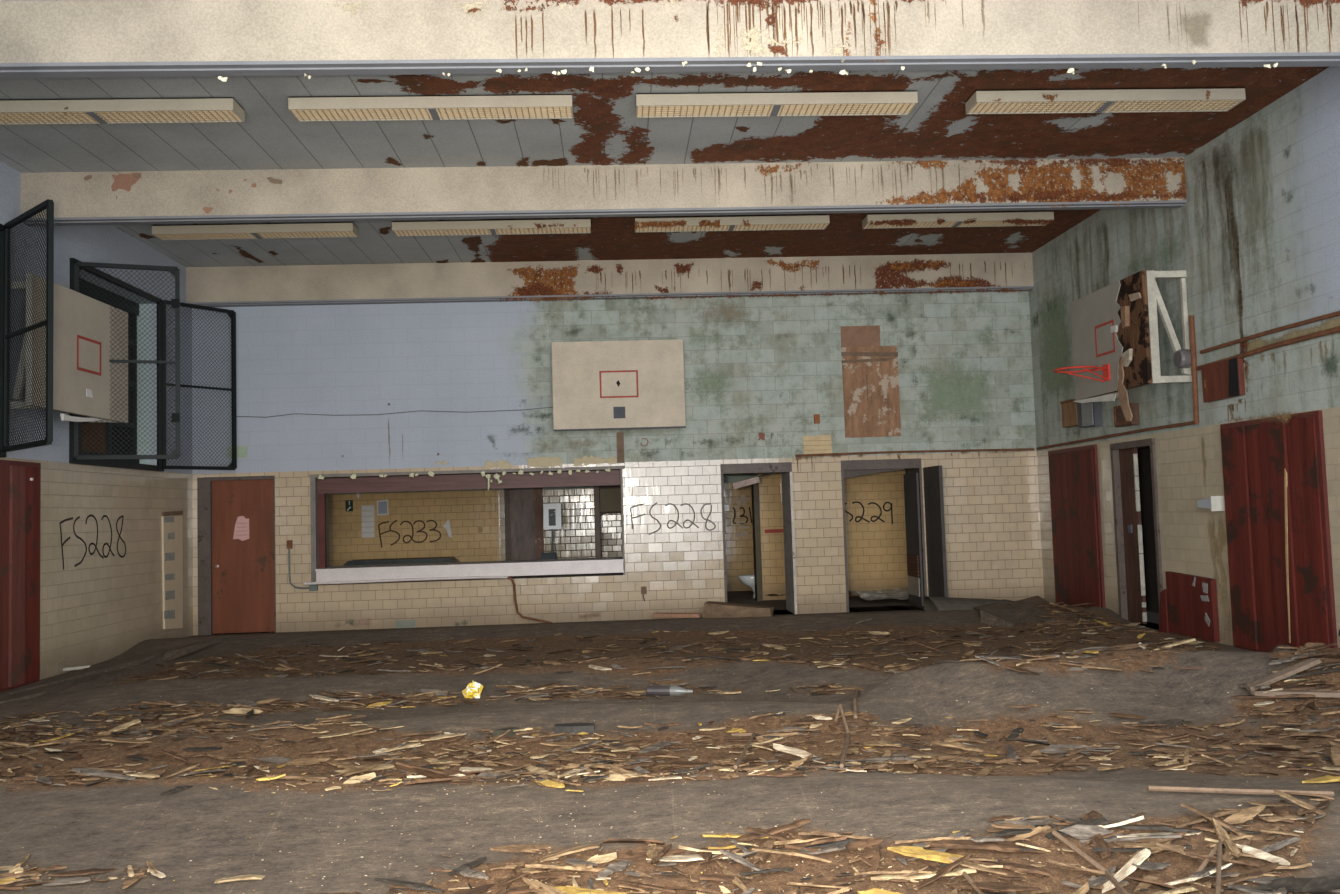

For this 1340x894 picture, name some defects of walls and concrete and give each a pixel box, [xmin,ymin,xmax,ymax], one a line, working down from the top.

peeling [454,0,488,17]
rust [504,0,946,62]
rust [1184,16,1209,43]
rust [1239,0,1340,53]
peeling [353,60,1330,167]
rust [744,162,856,194]
rust [870,157,1187,227]
peeling [461,209,1101,263]
rust [499,259,1032,303]
water stain [1324,355,1337,374]